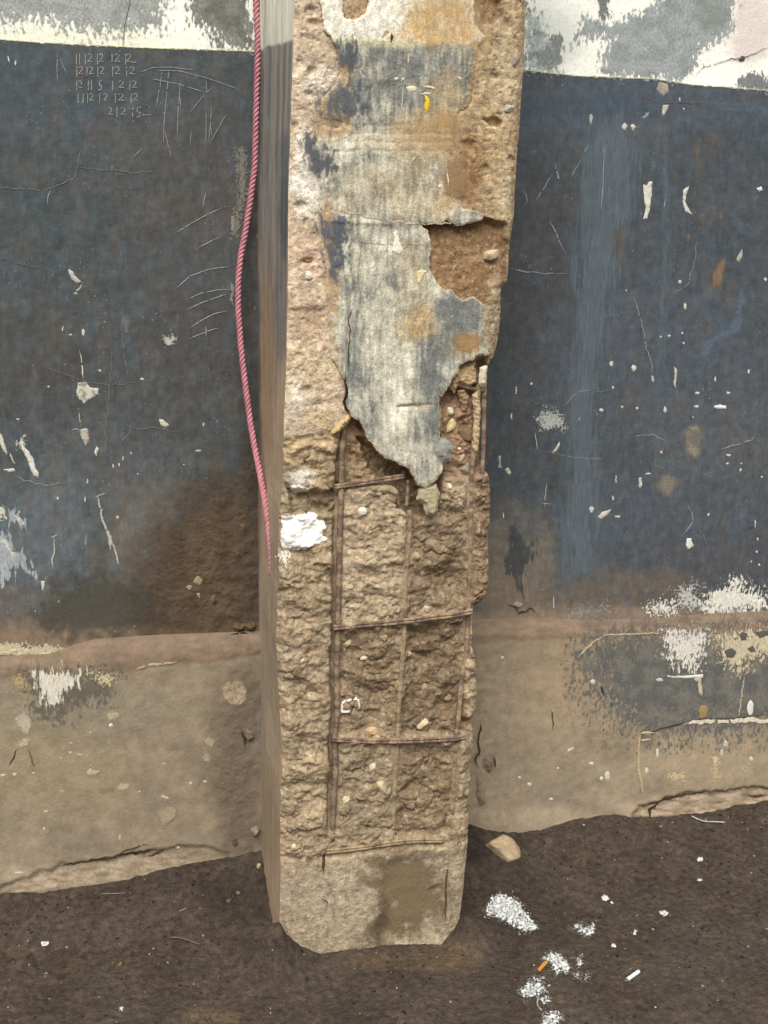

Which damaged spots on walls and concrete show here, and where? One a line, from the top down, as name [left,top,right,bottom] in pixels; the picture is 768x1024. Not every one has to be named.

peeling [0,0,255,57]
crack [703,48,766,68]
crack [0,149,153,205]
peeling [0,434,39,477]
spalling [276,0,768,864]
water stain [640,574,768,619]
crack [61,844,165,866]
water stain [365,848,453,946]